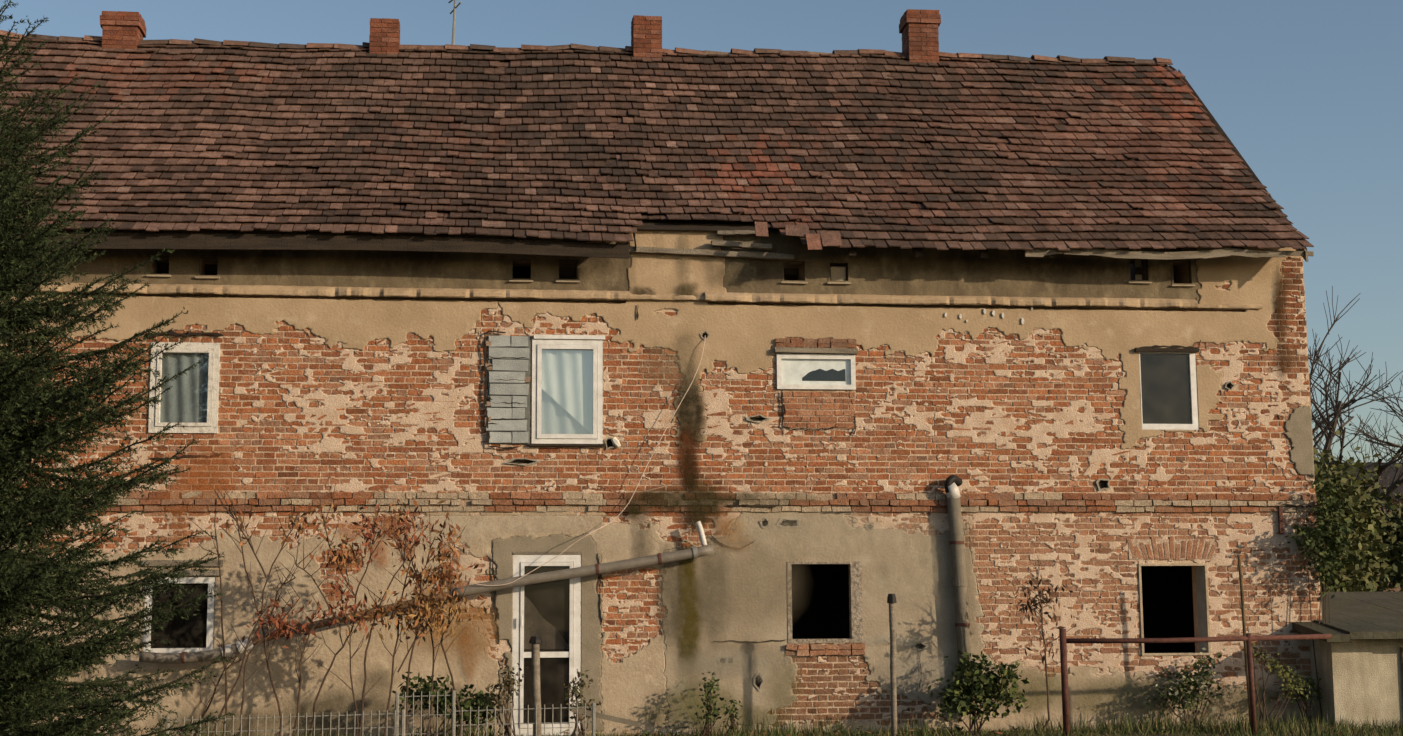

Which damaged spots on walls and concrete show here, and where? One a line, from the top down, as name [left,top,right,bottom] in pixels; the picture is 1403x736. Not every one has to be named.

spalling [13,257,1315,495]
water stain [677,383,704,488]
spalling [16,512,427,601]
spalling [437,536,511,669]
spalling [595,568,667,663]
spalling [603,512,741,549]
spalling [844,512,1322,710]
spalling [767,643,949,727]